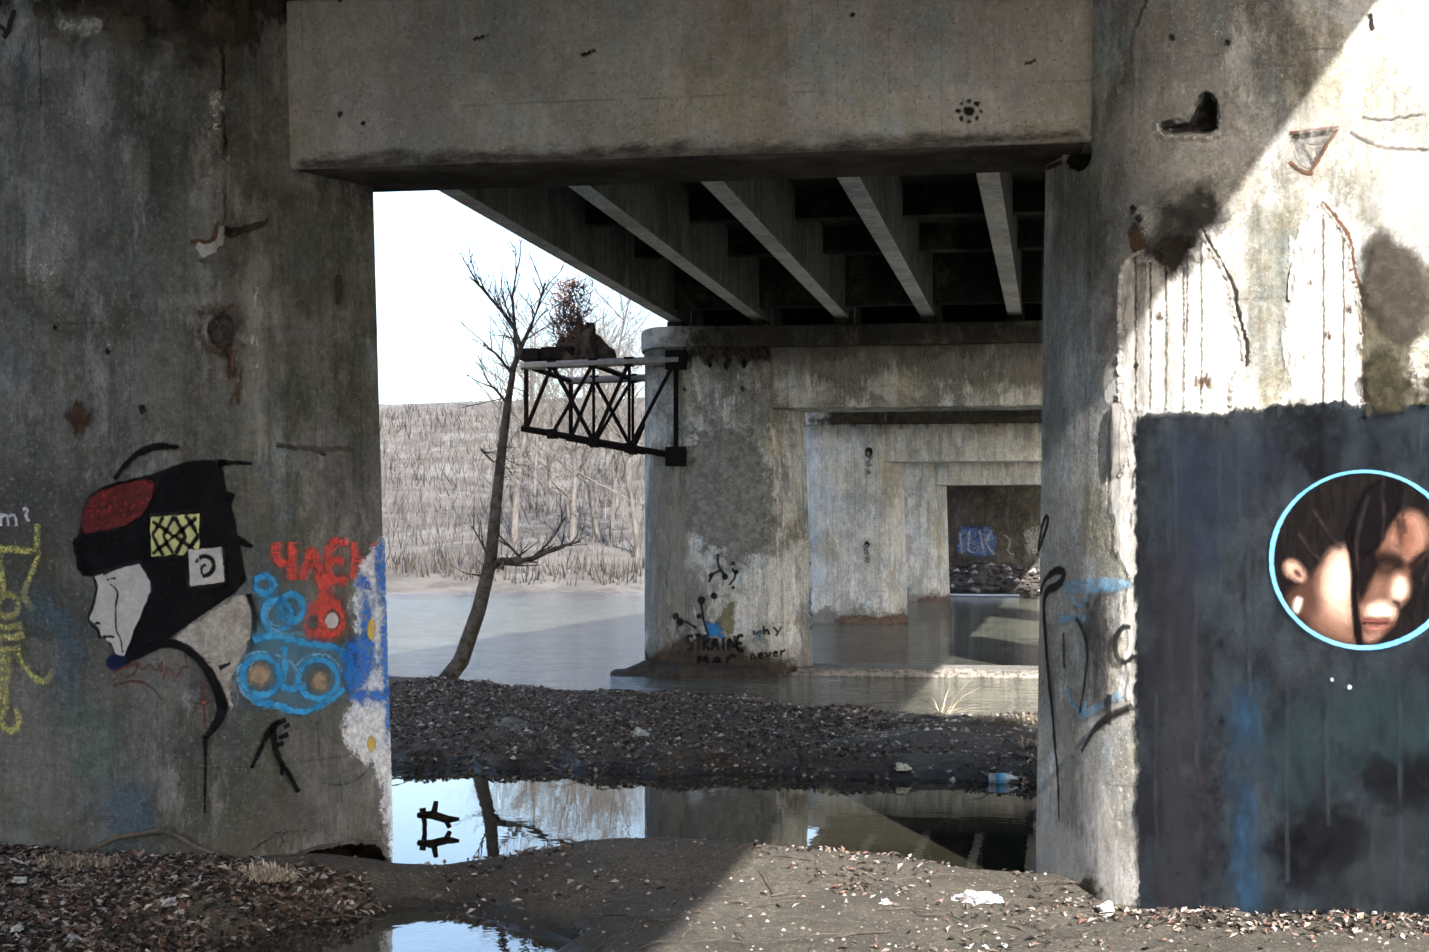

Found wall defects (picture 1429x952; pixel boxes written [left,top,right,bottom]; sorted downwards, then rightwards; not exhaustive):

crack [1127,0,1156,138]
spalling [1152,90,1241,160]
spalling [190,219,268,265]
flaking render [1279,201,1369,408]
corrosion [64,399,94,438]